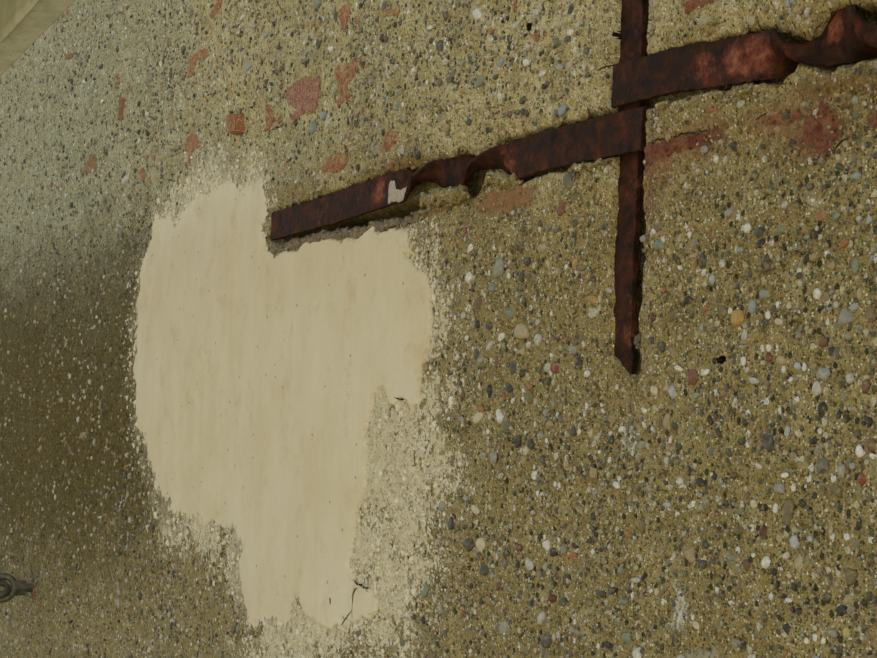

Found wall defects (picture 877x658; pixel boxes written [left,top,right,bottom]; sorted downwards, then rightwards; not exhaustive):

rust [683,0,714,15]
rust [766,97,843,159]
spalling [482,169,524,190]
spalling [569,157,617,173]
rust [643,128,722,177]
spalling [271,184,472,254]
peeling [352,581,379,624]